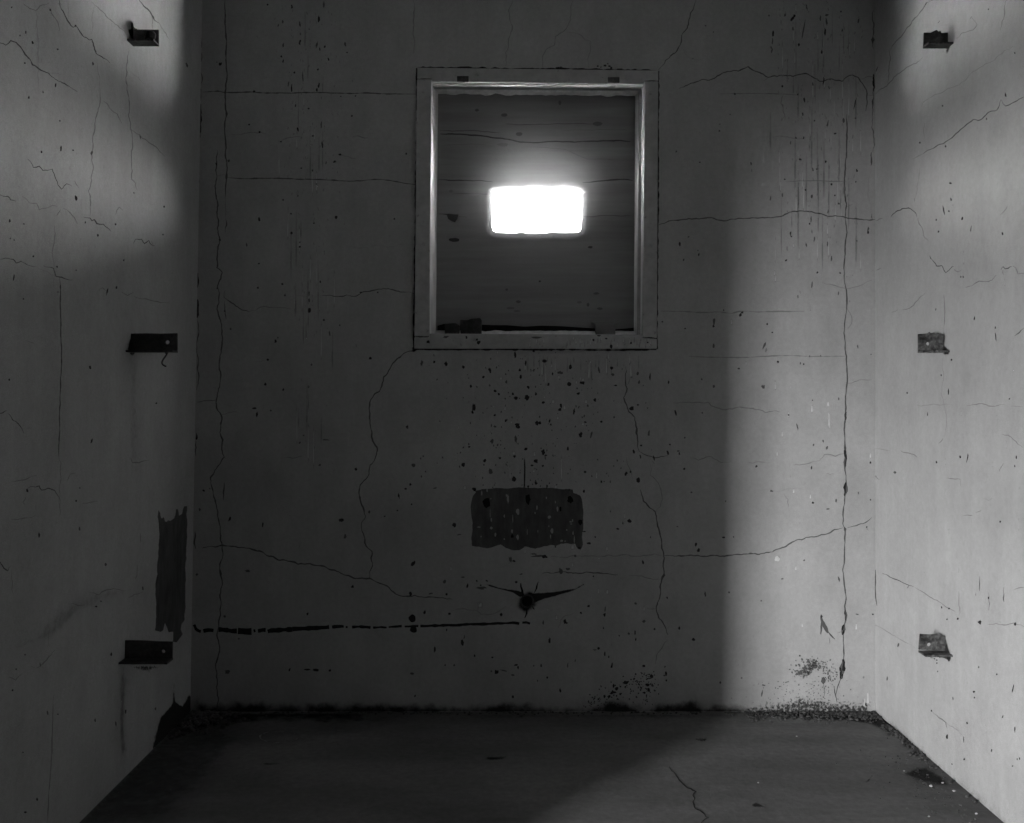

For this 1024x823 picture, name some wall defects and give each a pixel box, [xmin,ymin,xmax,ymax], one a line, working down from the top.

crack [1,0,161,520]
crack [193,3,450,709]
crack [542,0,1024,701]